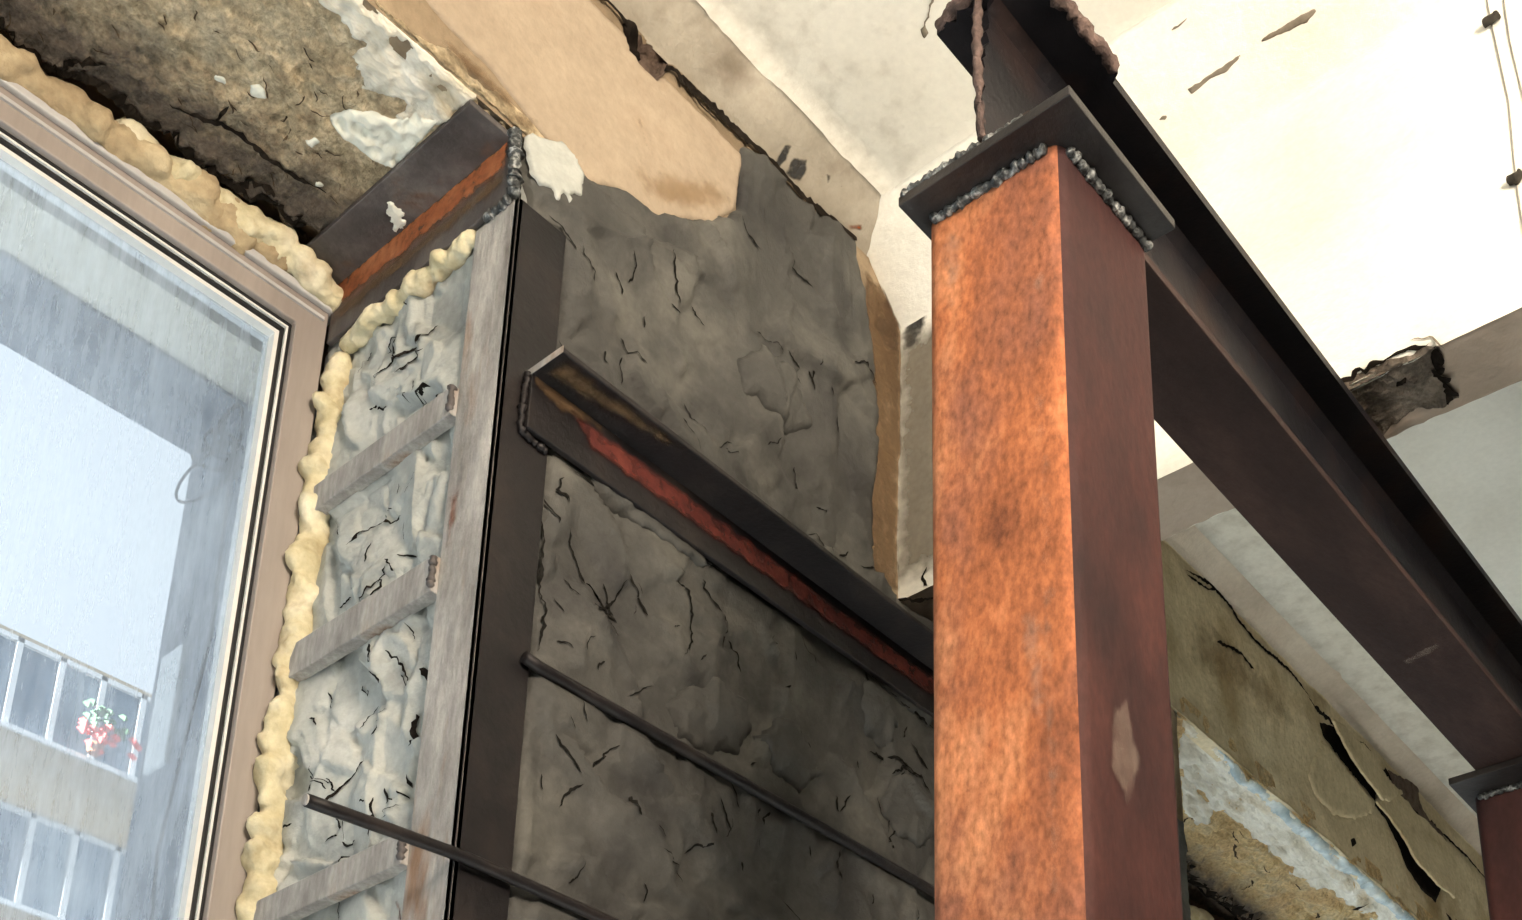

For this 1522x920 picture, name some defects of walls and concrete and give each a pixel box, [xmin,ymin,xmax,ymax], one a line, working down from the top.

crack [0,8,373,228]
peeling [250,84,266,99]
peeling [318,0,476,168]
spalling [622,19,668,80]
corrosion [338,141,508,301]
spalling [1341,336,1459,436]
crack [346,515,401,545]
crack [385,650,428,740]
crack [1187,570,1485,878]
crack [325,761,374,862]
peeling [1174,710,1416,920]
peeling [1320,718,1457,902]